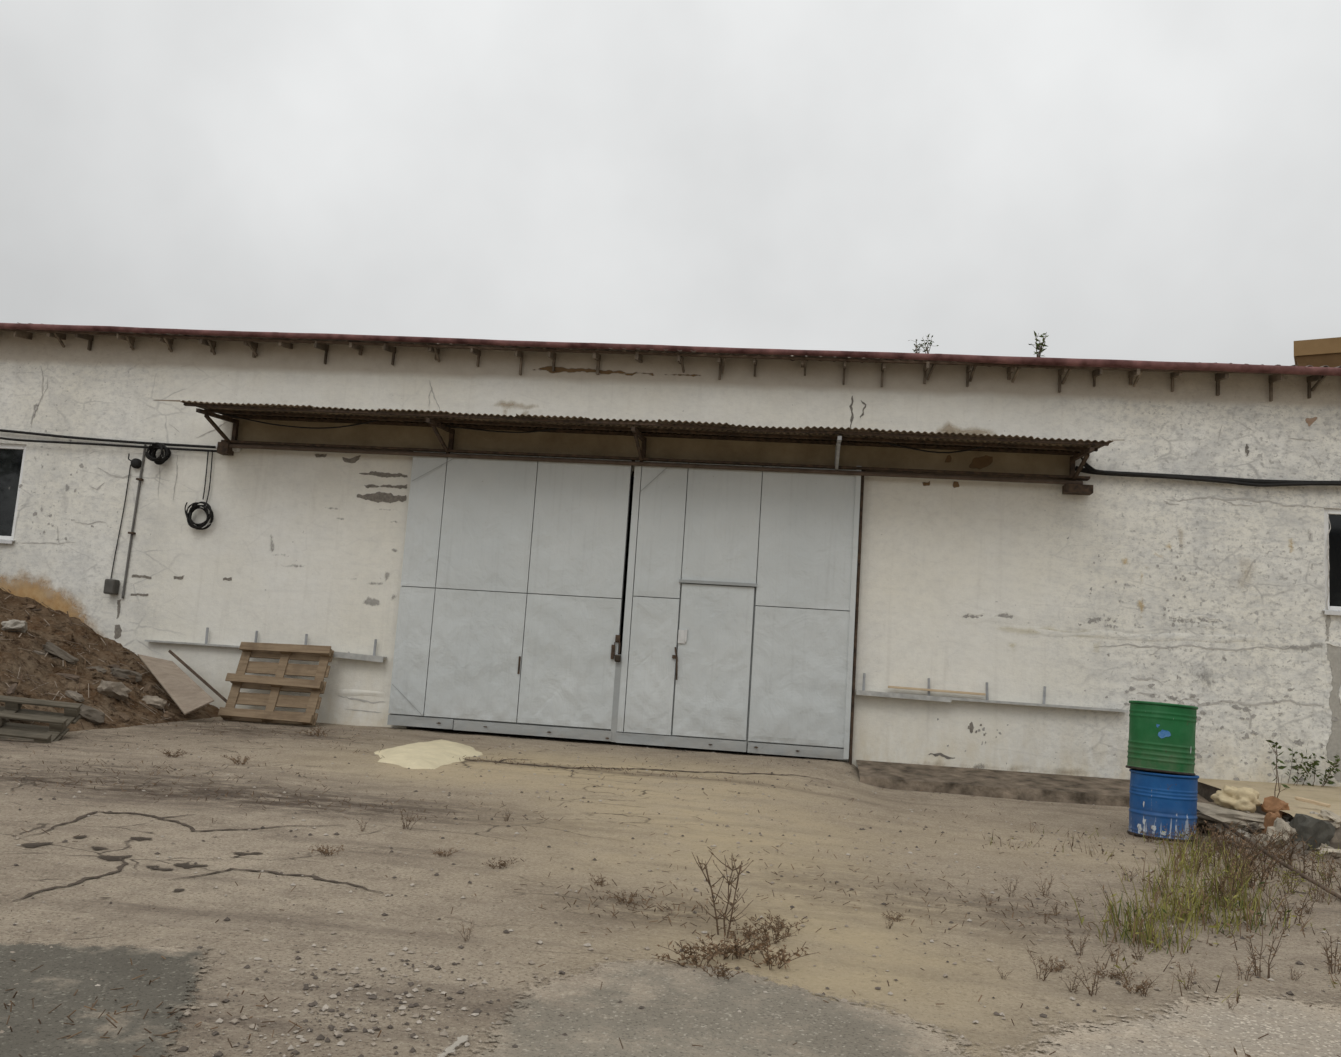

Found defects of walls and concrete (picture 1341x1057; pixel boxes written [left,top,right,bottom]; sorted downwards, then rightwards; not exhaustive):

peeling [342,455,408,503]
peeling [1124,684,1304,781]
flaking render [1284,615,1341,787]